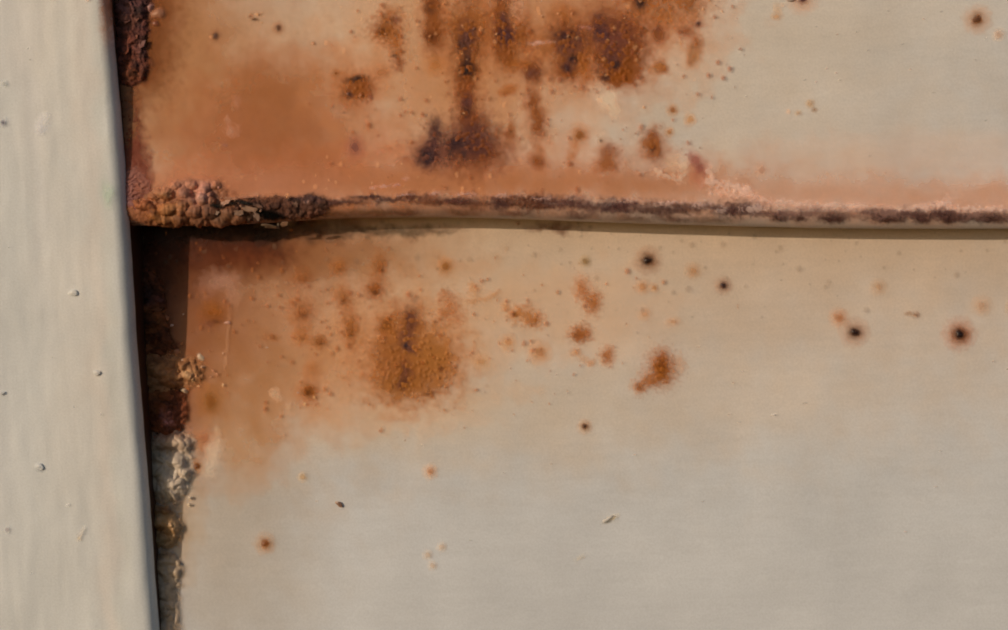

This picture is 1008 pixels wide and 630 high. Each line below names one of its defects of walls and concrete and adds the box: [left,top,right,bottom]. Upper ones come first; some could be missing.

corrosion [102,0,169,214]
corrosion [177,0,1008,224]
corrosion [142,265,178,357]
corrosion [148,387,189,435]
corrosion [370,311,459,405]
corrosion [635,351,675,391]
corrosion [848,327,861,338]
corrosion [950,326,969,342]